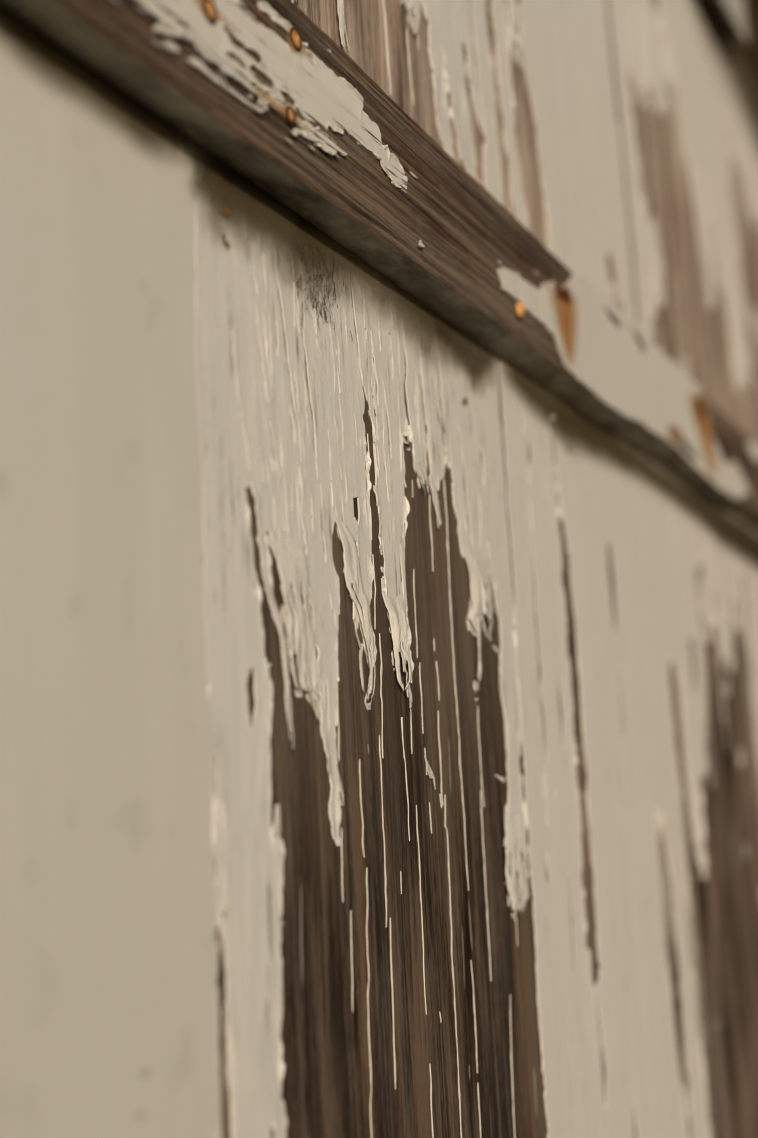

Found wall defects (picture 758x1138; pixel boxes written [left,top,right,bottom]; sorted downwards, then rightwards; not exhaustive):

corrosion [197,0,220,23]
corrosion [289,27,306,52]
peeling [135,0,550,249]
peeling [496,33,758,499]
peeling [216,906,232,1138]
peeling [245,388,547,1138]
peeling [552,427,606,1098]
peeling [657,537,758,1138]